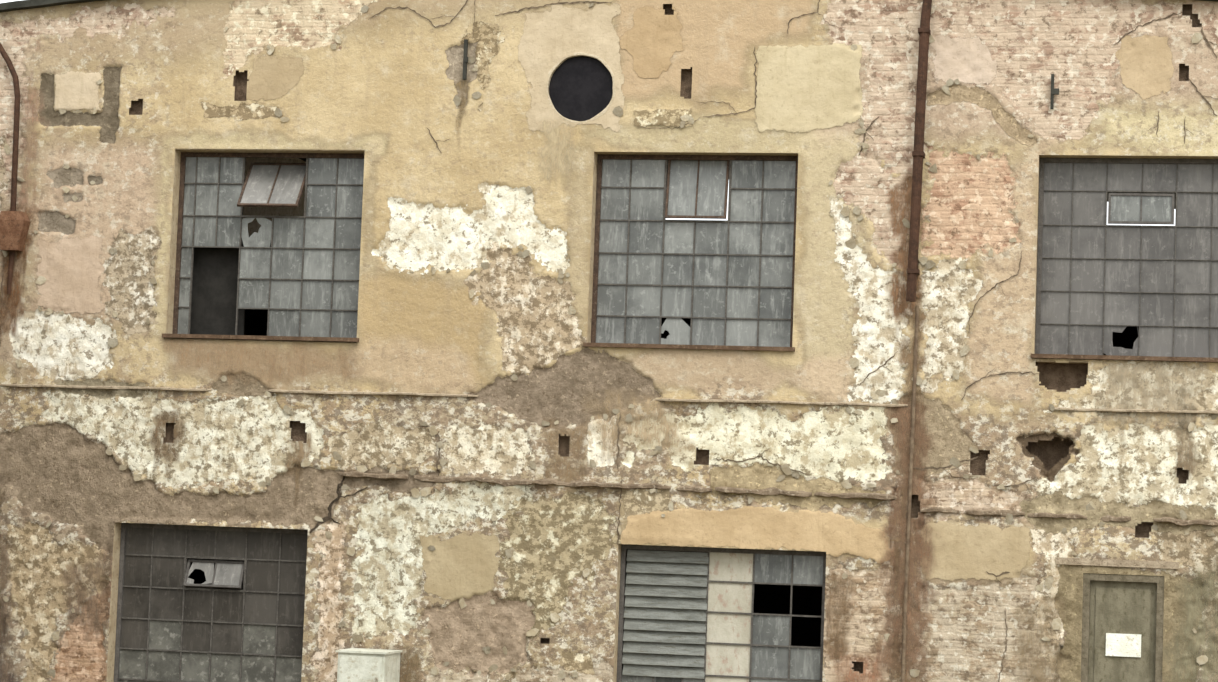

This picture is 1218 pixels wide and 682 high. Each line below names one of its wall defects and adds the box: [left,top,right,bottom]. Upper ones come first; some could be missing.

crack [368,0,612,39]
crack [1113,12,1218,58]
flaking render [0,3,176,212]
crack [1148,79,1217,144]
flaking render [34,164,103,235]
rust [0,234,31,333]
crack [969,251,1022,331]
flaking render [371,0,1218,682]
flaking render [0,228,674,682]
damp [888,311,926,682]
damp [827,573,851,658]